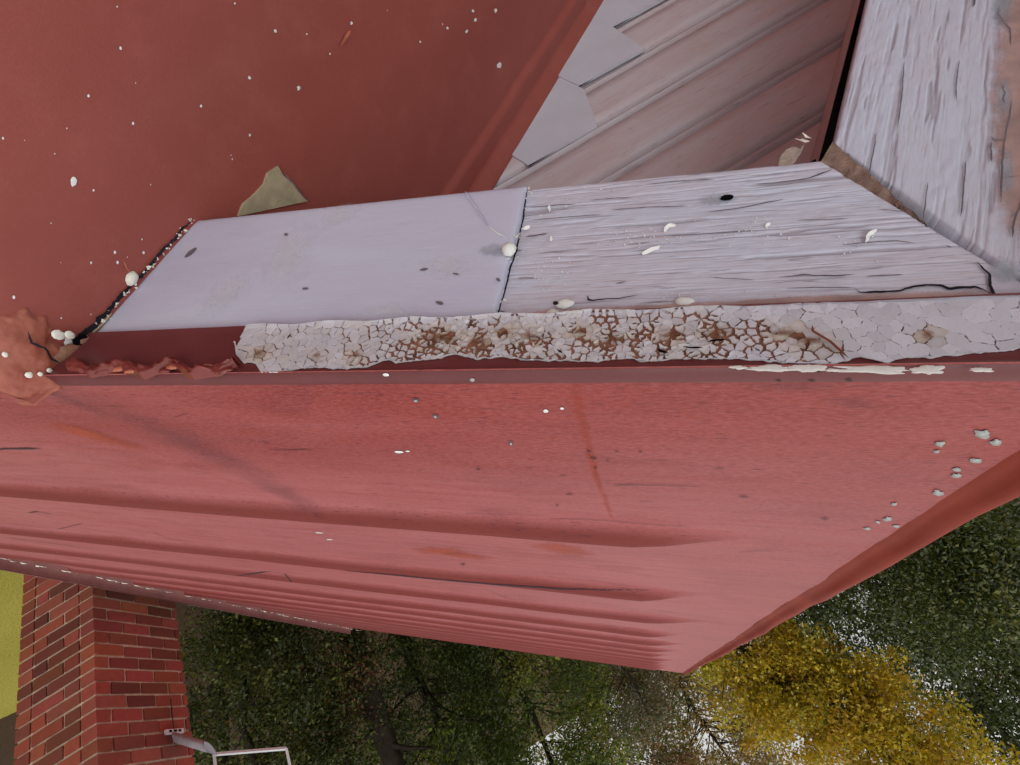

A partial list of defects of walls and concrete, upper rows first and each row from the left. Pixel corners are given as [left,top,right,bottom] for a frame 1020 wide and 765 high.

crack [973,0,1011,45]
crack [897,61,905,123]
peeling [598,223,688,255]
crack [843,183,928,245]
crack [959,162,967,214]
crack [990,85,1020,237]
crack [785,262,996,294]
peeling [233,294,1020,375]